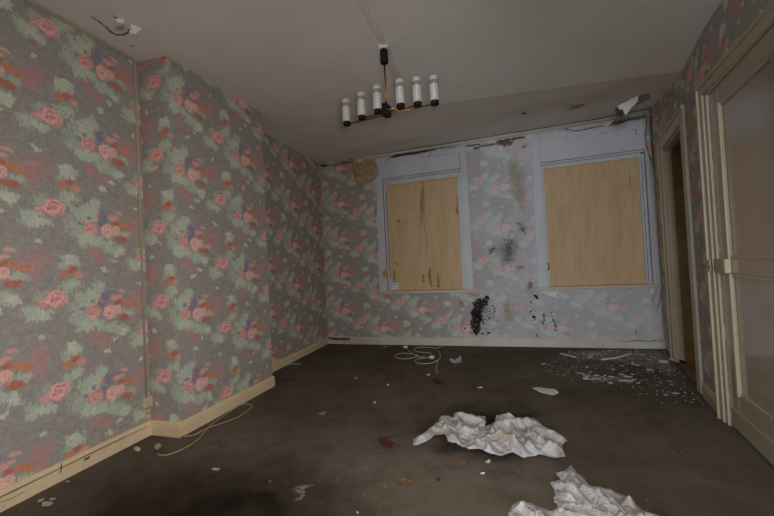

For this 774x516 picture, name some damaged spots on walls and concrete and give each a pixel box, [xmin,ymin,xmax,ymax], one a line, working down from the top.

peeling [613,94,650,135]
leakage [461,293,507,336]